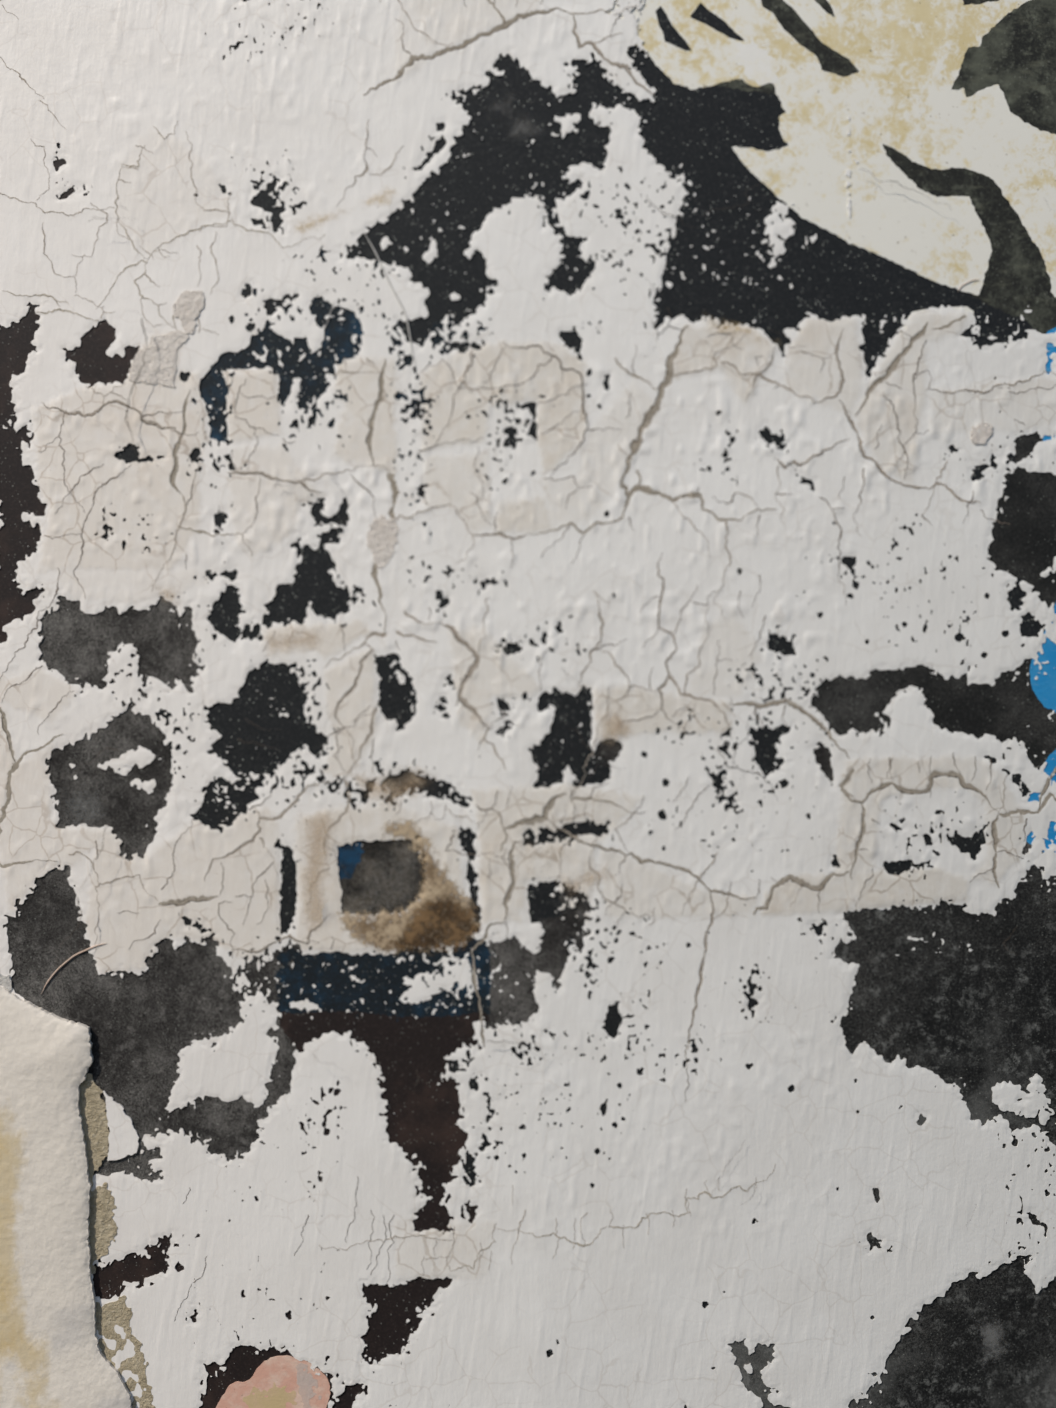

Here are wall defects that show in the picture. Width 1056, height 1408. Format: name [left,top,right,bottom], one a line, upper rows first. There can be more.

spalling [223,0,334,61]
peeling [951,0,1056,134]
peeling [0,302,722,1408]
crack [0,0,1056,1102]
peeling [63,46,1056,620]
spalling [710,943,772,1023]
peeling [645,411,1056,857]
peeling [797,838,1056,1408]
peeling [880,791,989,880]
peeling [727,1338,790,1408]